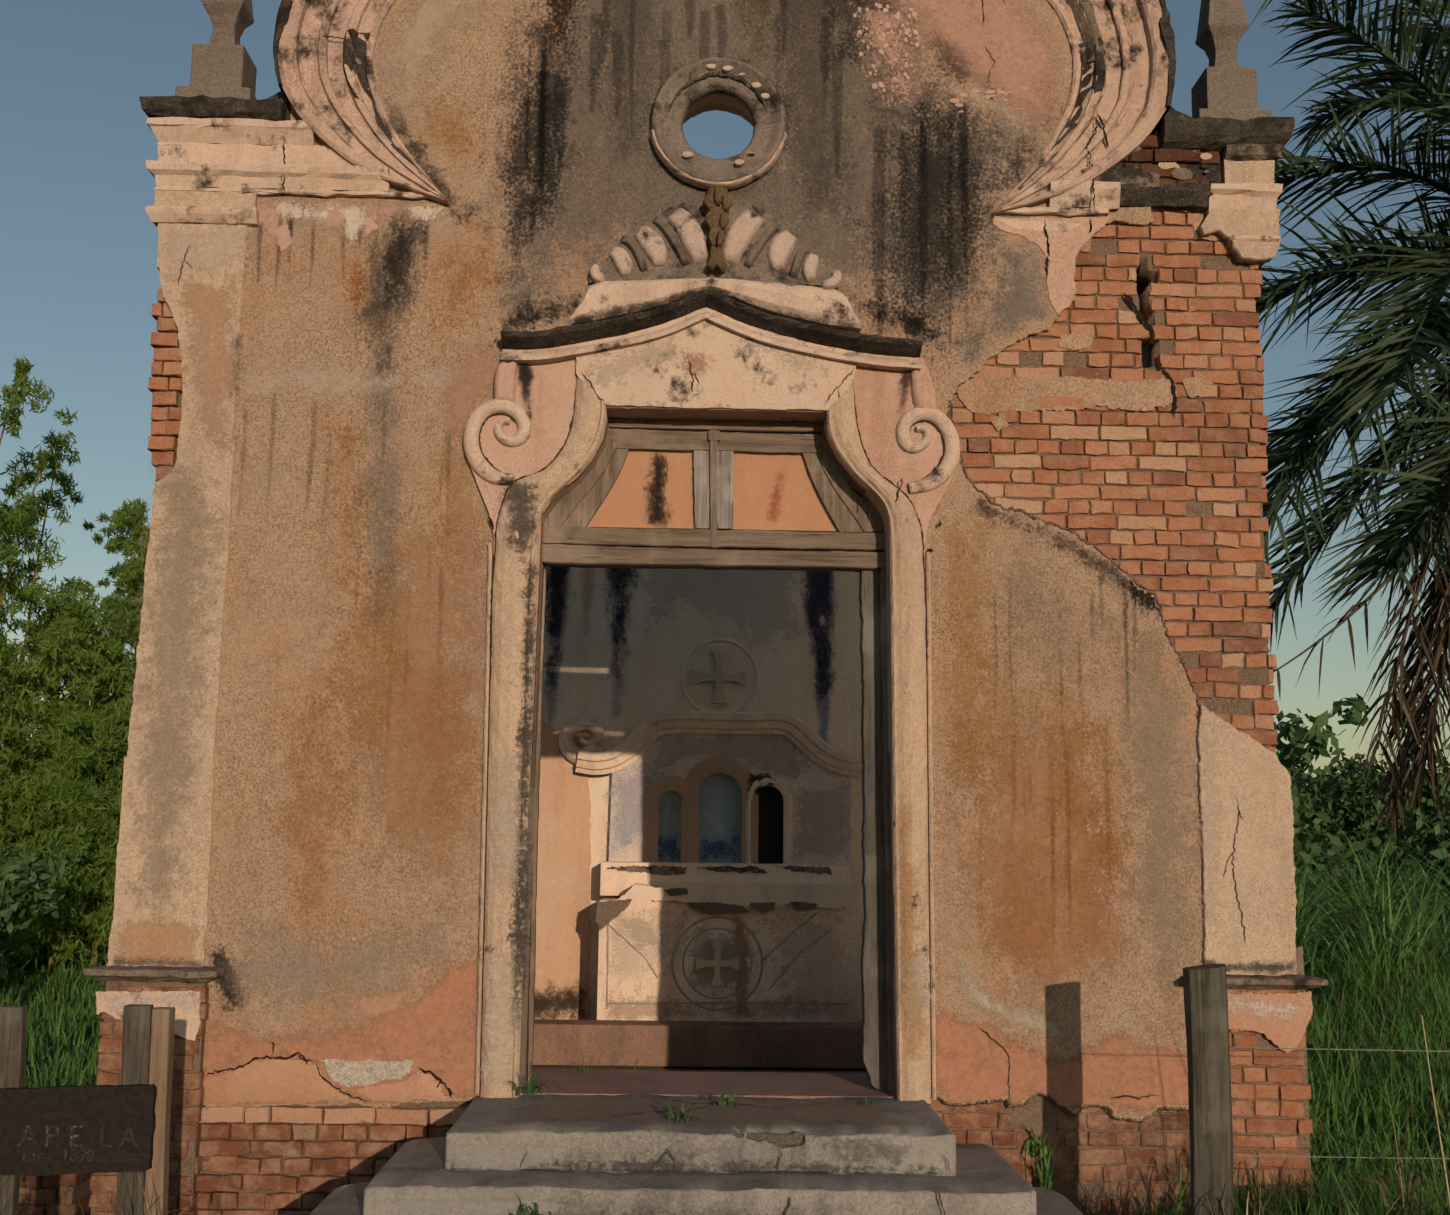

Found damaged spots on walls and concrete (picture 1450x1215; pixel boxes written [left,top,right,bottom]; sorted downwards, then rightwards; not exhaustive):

spalling [147,289,183,482]
crack [1124,292,1178,418]
spalling [947,208,1279,754]
damp [546,567,567,682]
crack [1224,799,1247,947]
peeling [99,992,194,1011]
peeling [1227,992,1309,1022]
spalling [320,1059,413,1087]
spalling [196,1105,467,1215]